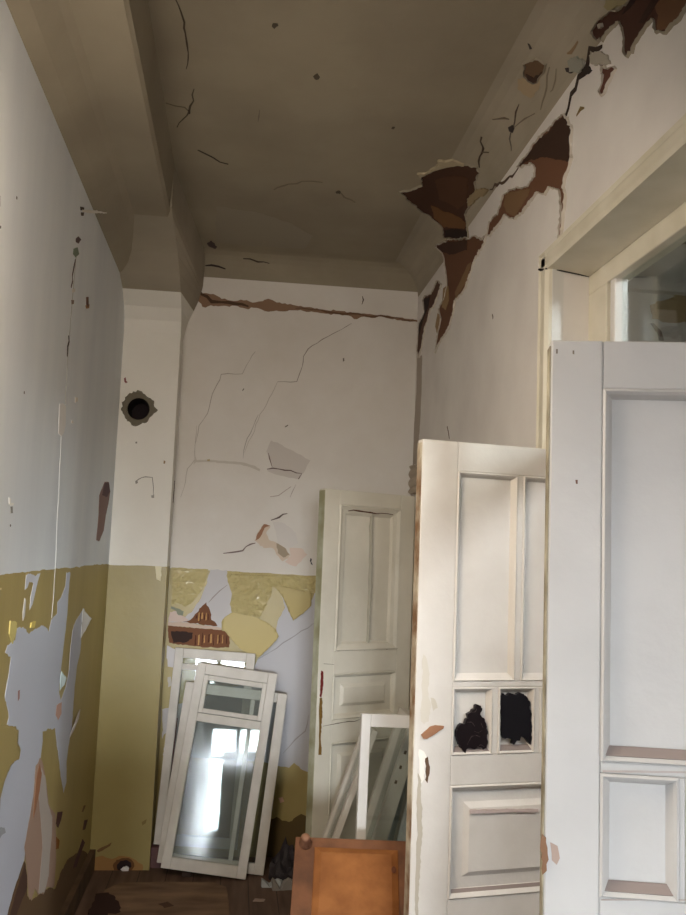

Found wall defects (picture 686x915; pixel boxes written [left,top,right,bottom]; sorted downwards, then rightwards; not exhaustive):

crack [166,0,194,128]
crack [478,41,602,190]
spalling [565,0,686,97]
crack [205,258,269,269]
spalling [399,113,573,358]
flaking render [96,482,110,541]
crack [137,352,255,501]
crack [267,453,302,520]
crack [198,292,417,456]
peeling [0,572,88,915]
peeling [167,569,232,687]
peeling [190,593,315,772]